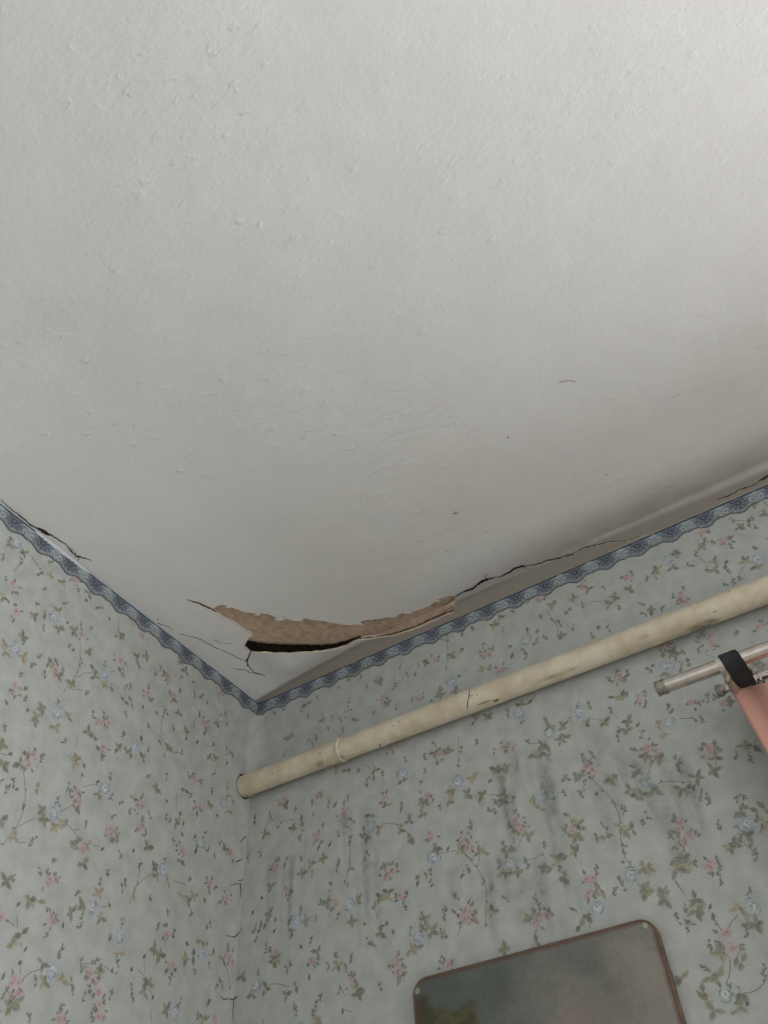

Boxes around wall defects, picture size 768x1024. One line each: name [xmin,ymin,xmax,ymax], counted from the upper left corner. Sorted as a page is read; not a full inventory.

crack [0,499,92,562]
crack [455,535,643,597]
crack [157,618,266,676]
flaking render [186,596,456,653]